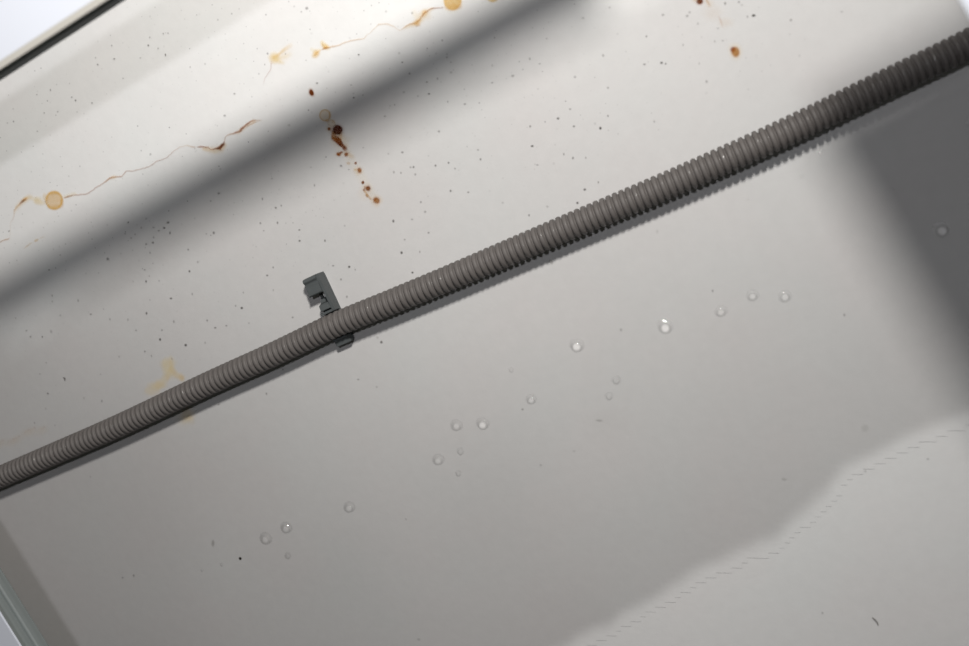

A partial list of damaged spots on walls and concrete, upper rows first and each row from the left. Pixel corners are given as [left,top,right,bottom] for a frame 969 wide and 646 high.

damp [0,0,969,465]